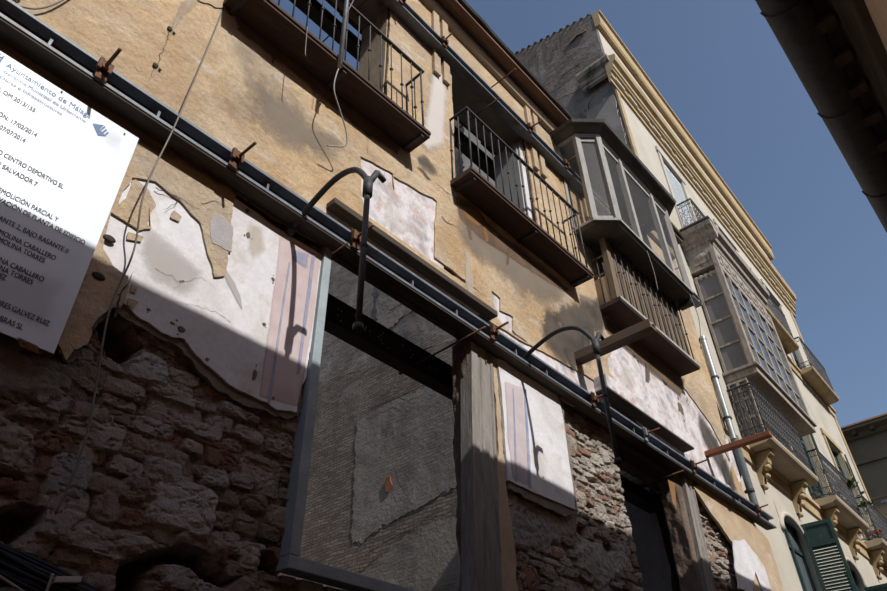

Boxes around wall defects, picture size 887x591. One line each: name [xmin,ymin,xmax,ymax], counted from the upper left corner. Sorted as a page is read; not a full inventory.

peeling [118,179,156,225]
peeling [210,212,233,252]
peeling [69,267,151,374]
leakage [462,223,623,370]
leakage [624,341,684,395]
hole [0,500,52,548]
hole [114,542,245,591]
hole [257,549,285,580]